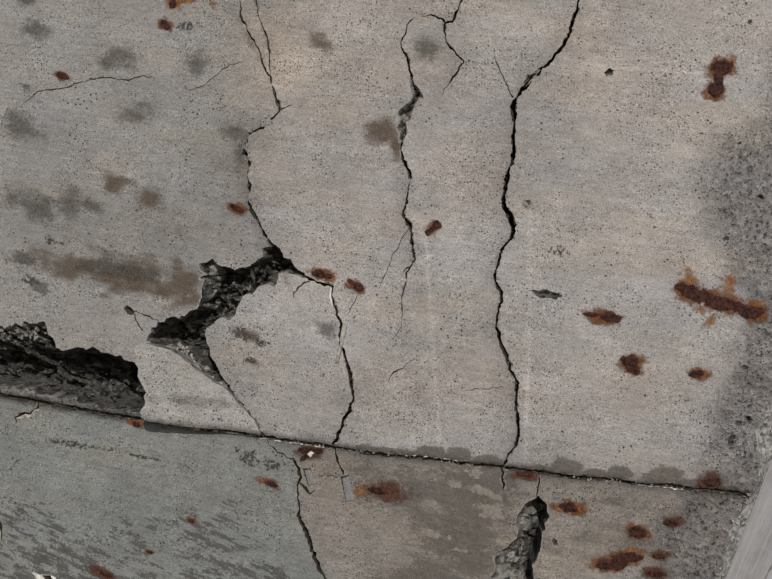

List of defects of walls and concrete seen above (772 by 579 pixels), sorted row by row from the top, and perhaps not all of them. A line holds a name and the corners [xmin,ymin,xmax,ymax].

crack [400,0,464,97]
rust [701,56,736,101]
crack [379,133,416,340]
crack [465,0,580,490]
spalling [146,237,305,386]
rust [583,308,623,326]
rust [674,268,769,327]
spalling [0,321,146,413]
rust [618,354,645,376]
crack [226,276,357,579]
spalling [489,495,558,579]
rust [589,548,670,579]